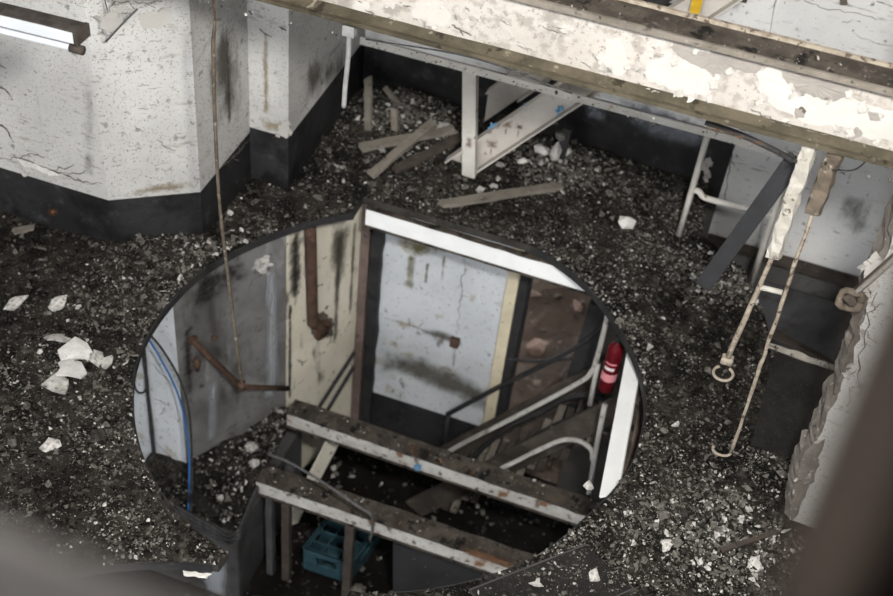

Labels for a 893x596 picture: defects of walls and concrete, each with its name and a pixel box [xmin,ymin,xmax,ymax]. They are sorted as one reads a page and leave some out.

damp [215,34,233,120]
peeling [596,38,893,141]
crack [0,124,102,185]